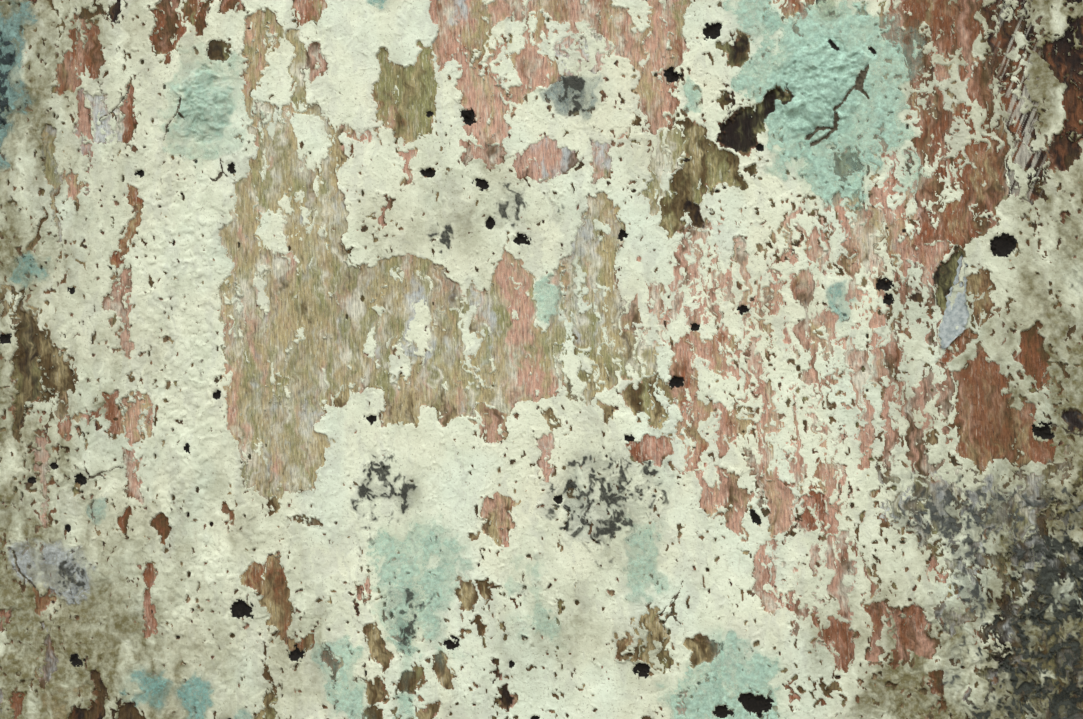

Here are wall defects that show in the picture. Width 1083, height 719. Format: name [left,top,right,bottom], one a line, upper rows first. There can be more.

spalling [144,271,187,356]
spalling [1064,325,1083,354]
spalling [567,480,616,546]
spalling [68,656,146,719]
peeling [119,512,180,639]
spalling [180,562,220,623]
peeling [316,547,464,719]
peeling [440,573,557,719]
spalling [526,646,594,719]
water stain [898,476,1083,719]